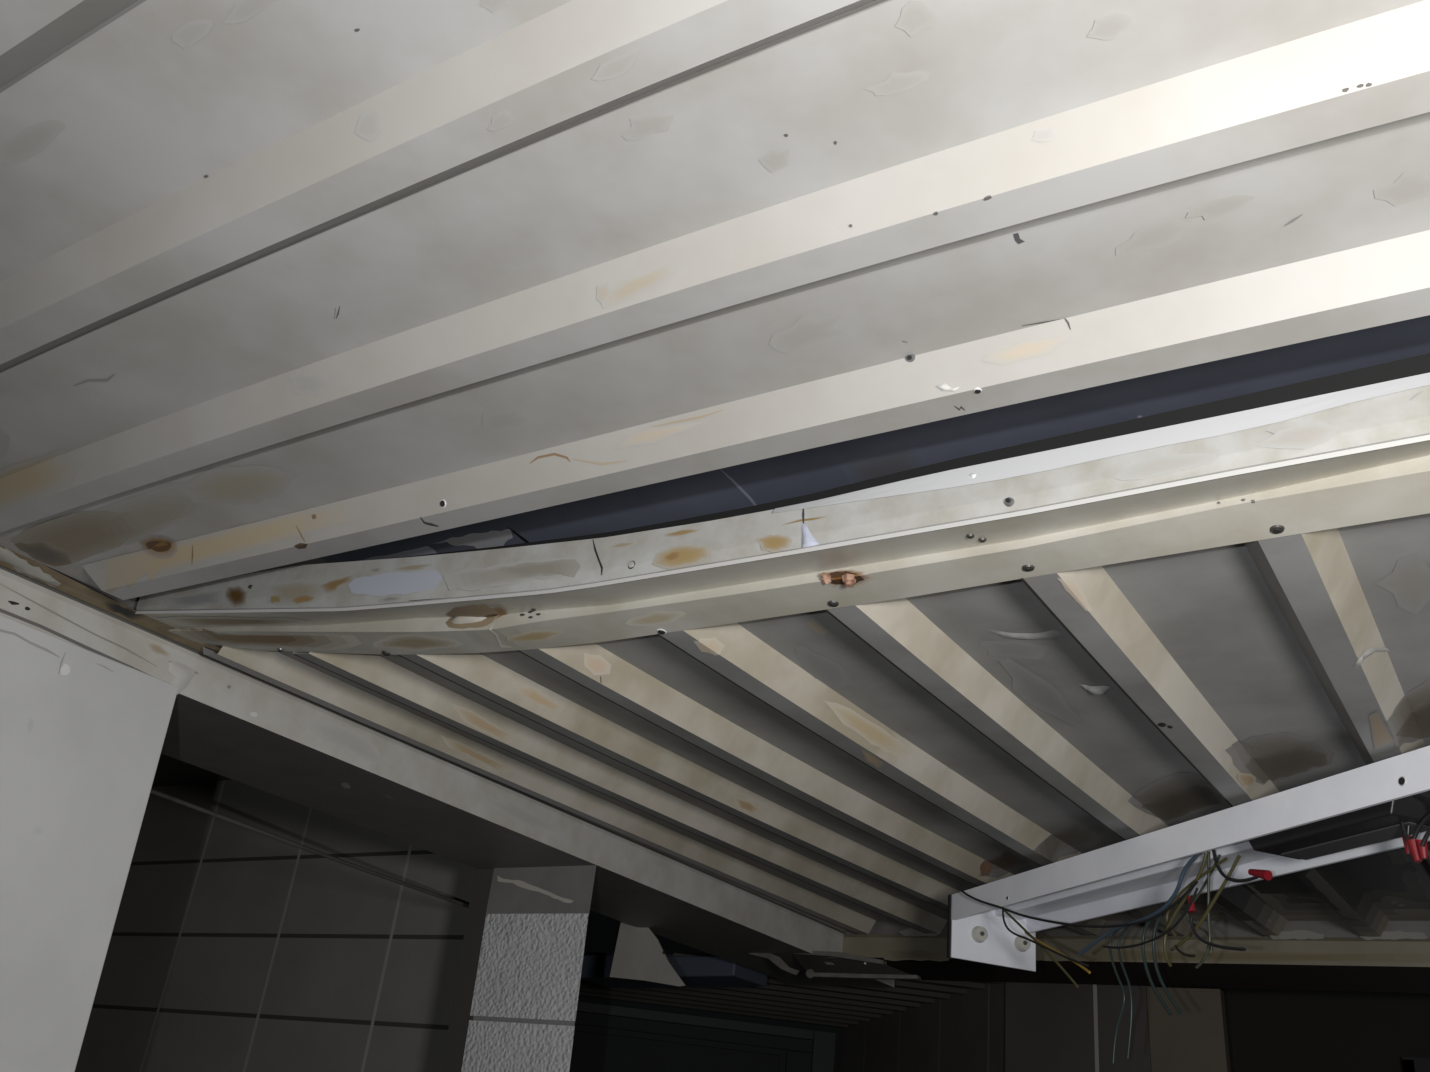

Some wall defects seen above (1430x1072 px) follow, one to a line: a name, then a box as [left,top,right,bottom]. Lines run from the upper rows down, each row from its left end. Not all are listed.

corrosion [139,536,193,561]
leakage [10,466,463,658]
corrosion [652,529,711,569]
corrosion [818,569,874,588]
leakage [1232,735,1328,783]
leakage [1133,775,1220,821]